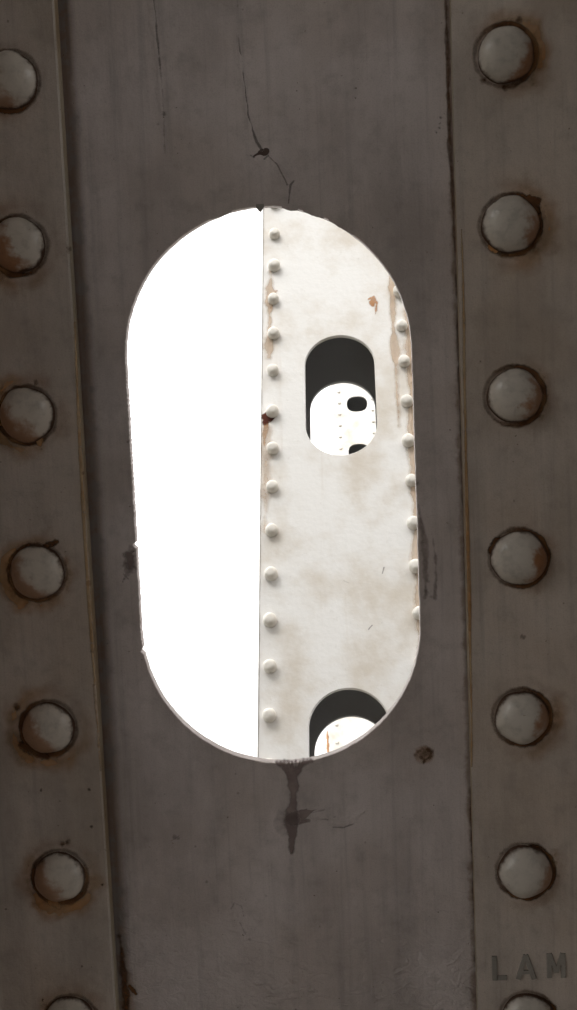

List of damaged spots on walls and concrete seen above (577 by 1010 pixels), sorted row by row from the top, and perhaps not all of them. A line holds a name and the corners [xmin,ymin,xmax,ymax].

crack [235,33,294,203]
water stain [275,759,368,854]